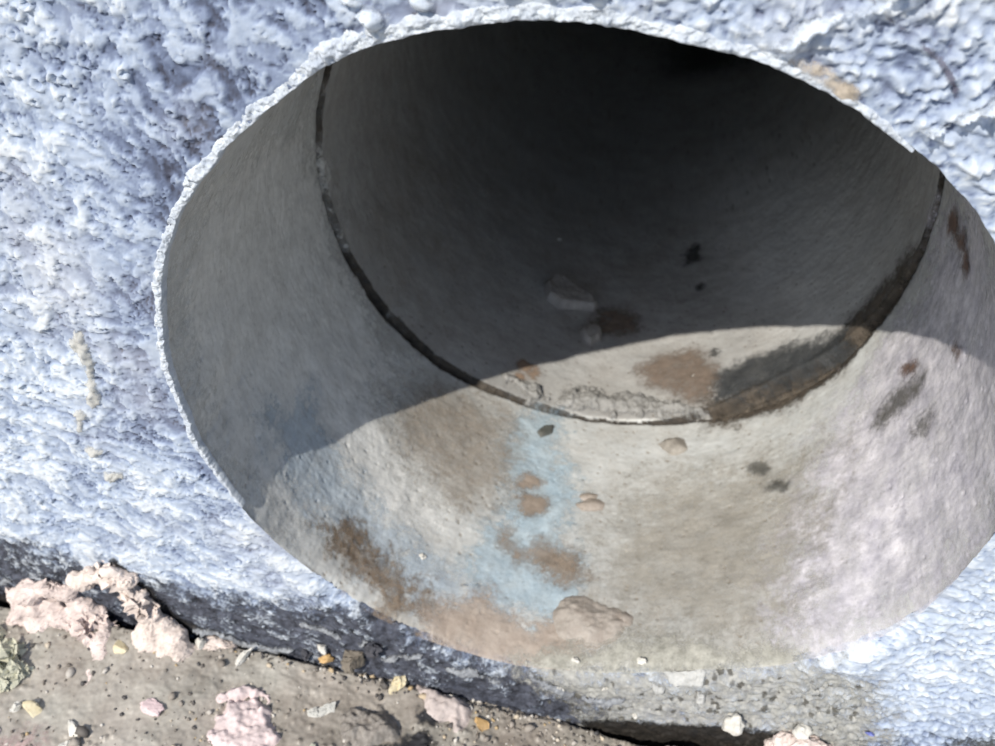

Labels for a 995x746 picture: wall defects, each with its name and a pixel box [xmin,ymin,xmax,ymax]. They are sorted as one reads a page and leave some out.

corrosion [590,308,641,336]
corrosion [634,350,719,403]
leakage [711,327,855,402]
leakage [762,193,995,658]
leakage [0,538,84,609]
leakage [78,584,138,630]
corrosion [317,519,439,623]
leakage [142,577,624,730]